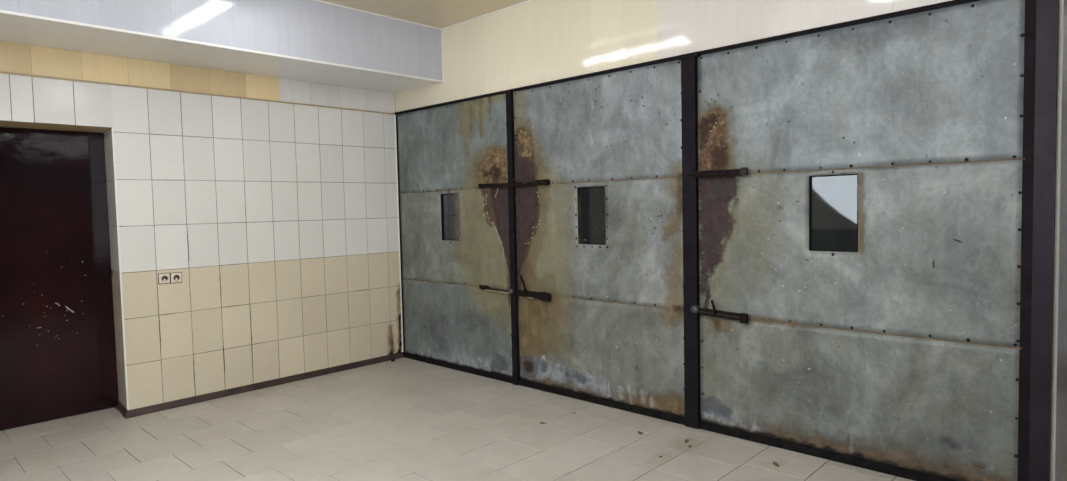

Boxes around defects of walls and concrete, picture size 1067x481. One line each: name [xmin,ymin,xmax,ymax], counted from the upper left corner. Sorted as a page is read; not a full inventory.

leakage [389,289,620,401]
corrosion [477,123,685,416]
corrosion [698,108,737,331]